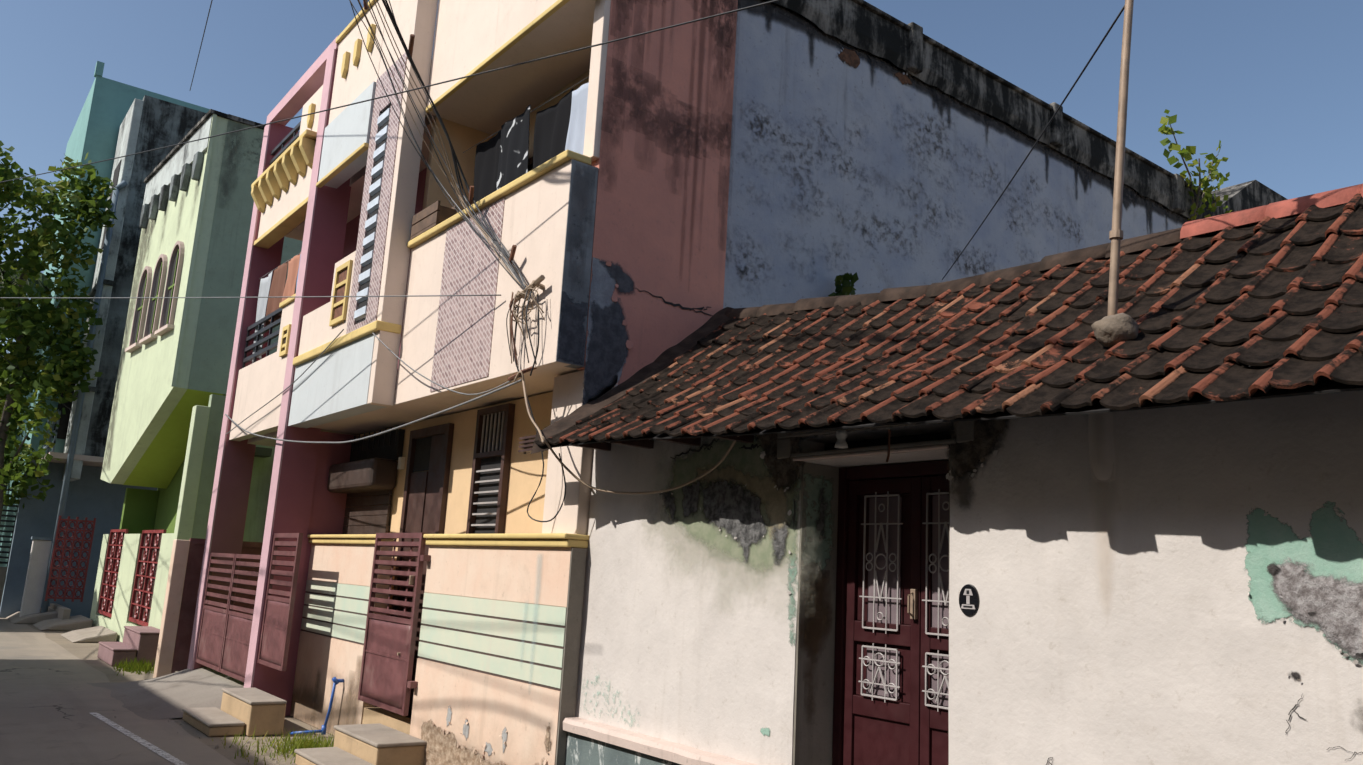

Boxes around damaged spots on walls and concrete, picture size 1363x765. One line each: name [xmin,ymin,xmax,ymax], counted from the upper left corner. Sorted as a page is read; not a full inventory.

damp [737,0,1192,233]
peeling [582,257,634,406]
crack [638,289,713,316]
peeling [660,437,834,645]
damp [801,576,831,676]
peeling [1244,501,1363,664]
flaking render [421,706,507,765]
flaking render [535,726,551,765]